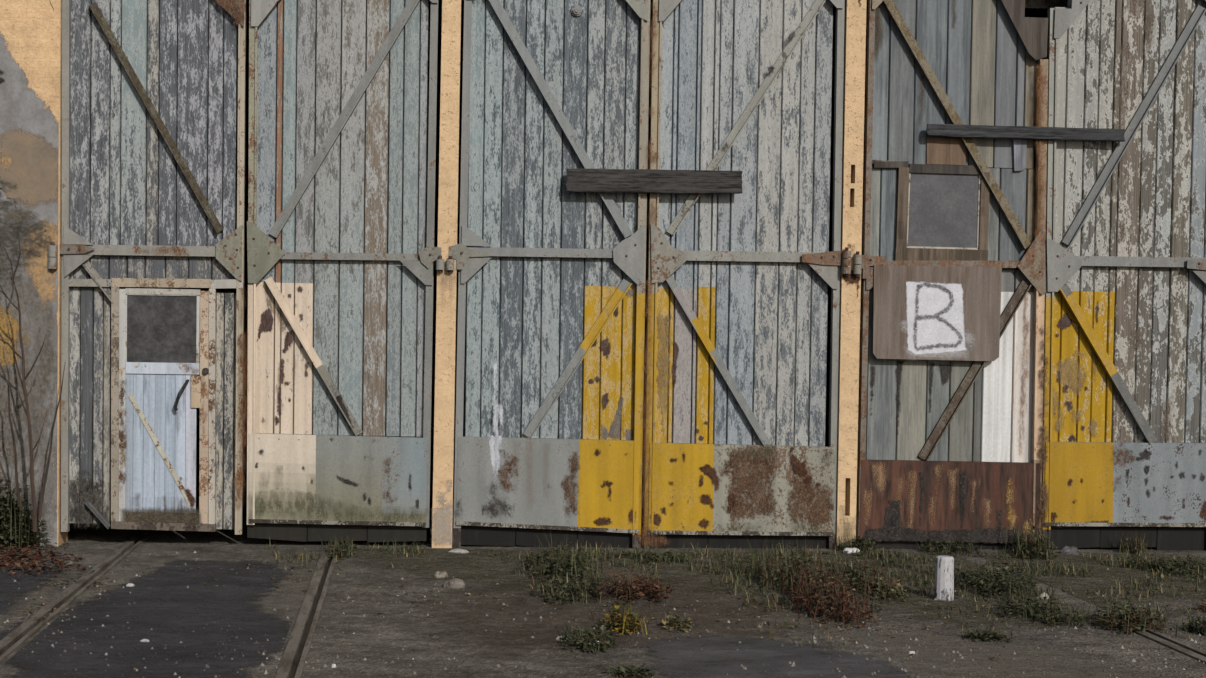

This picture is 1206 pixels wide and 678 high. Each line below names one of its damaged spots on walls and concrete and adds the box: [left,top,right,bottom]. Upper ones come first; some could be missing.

flaking render [0,34,59,547]